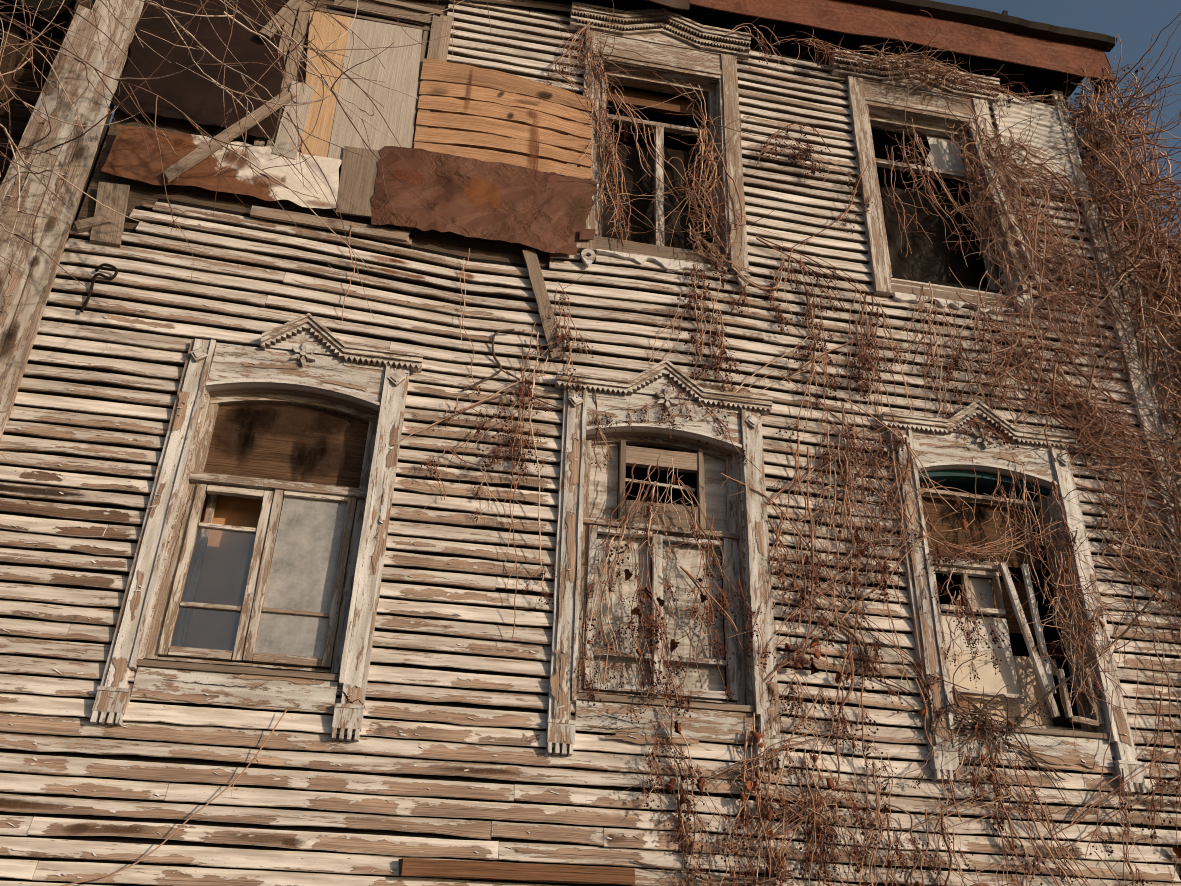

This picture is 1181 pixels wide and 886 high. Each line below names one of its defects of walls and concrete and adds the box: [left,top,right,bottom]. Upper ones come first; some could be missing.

peeling [26,119,46,158]
rust [225,151,250,168]
peeling [0,267,23,325]
peeling [57,270,250,329]
peeling [173,391,190,431]
peeling [322,379,367,391]
water stain [220,402,351,479]
peeling [0,415,166,621]
peeling [565,511,577,583]
peeling [904,490,917,527]
peeling [0,610,111,640]
peeling [0,617,1181,886]